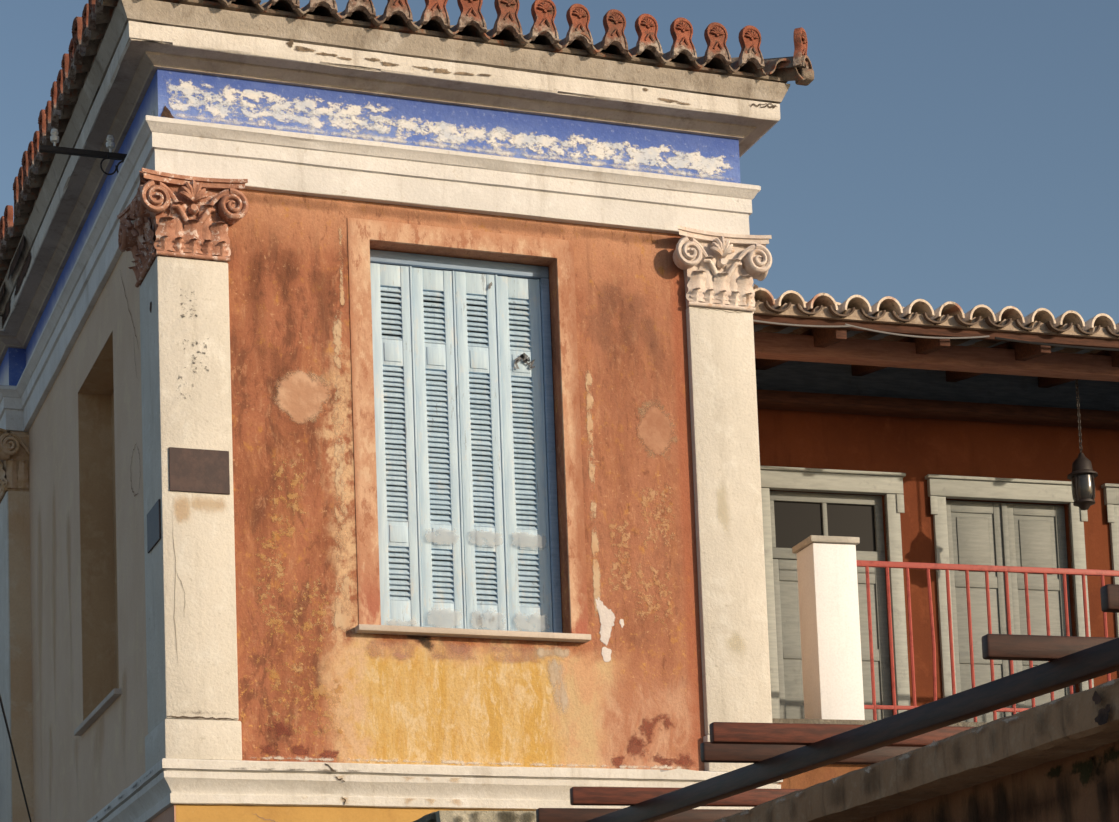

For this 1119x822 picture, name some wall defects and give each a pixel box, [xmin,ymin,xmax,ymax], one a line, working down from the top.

peeling [151,80,733,179]
peeling [586,374,595,488]
peeling [591,486,675,662]
water stain [408,635,433,648]
water stain [537,648,569,709]